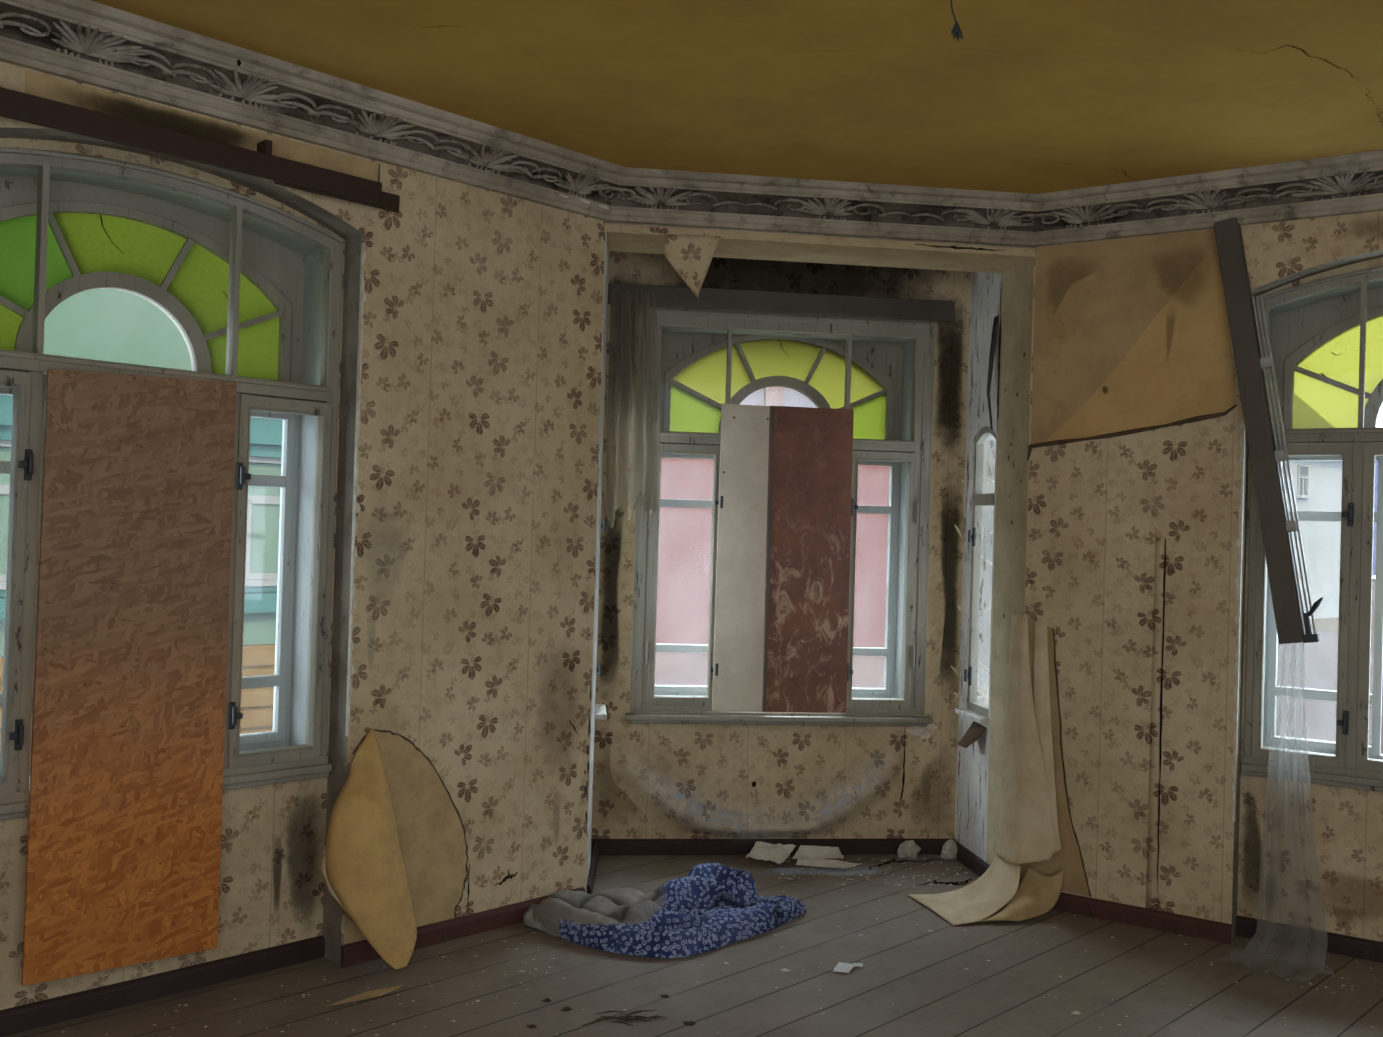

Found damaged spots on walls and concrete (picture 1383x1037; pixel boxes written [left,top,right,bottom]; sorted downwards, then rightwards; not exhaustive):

crack [1235,45,1383,126]
flaking render [345,243,367,737]
peeling [1019,617,1090,896]